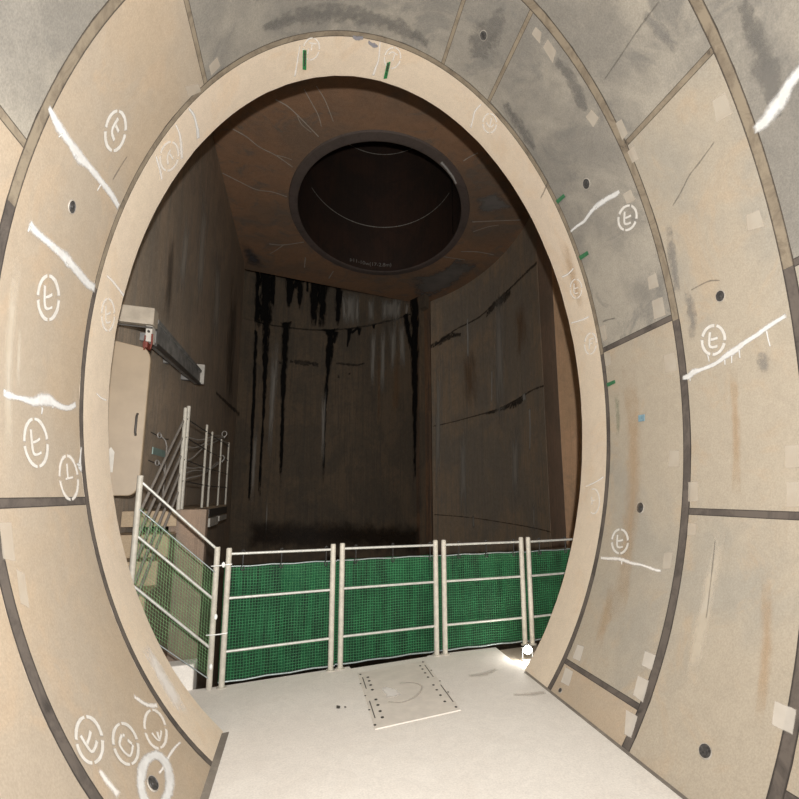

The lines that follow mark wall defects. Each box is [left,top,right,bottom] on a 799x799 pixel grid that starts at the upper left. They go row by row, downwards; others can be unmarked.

damp [245,249,292,499]
damp [285,277,361,468]